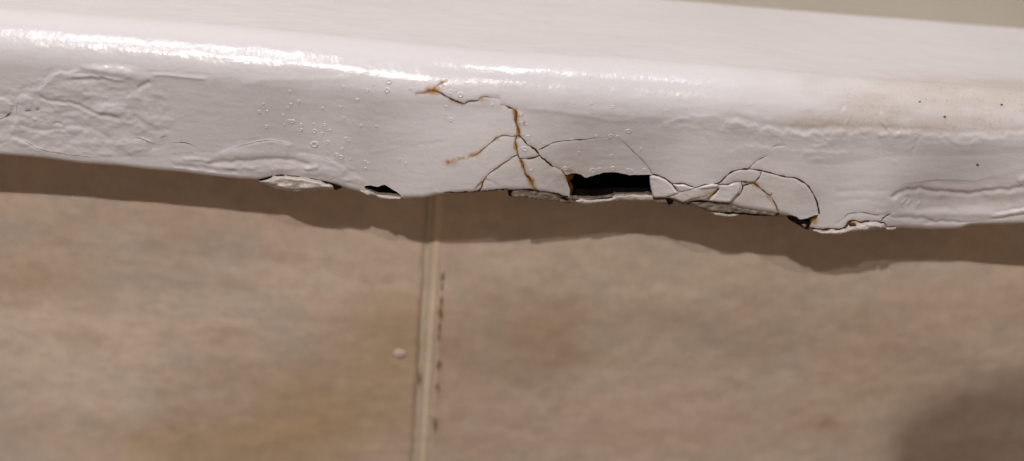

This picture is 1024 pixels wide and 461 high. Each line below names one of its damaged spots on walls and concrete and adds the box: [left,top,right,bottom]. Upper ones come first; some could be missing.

peeling [258,175,342,191]
spalling [360,185,401,200]
crack [424,90,891,231]
spalling [436,172,896,235]